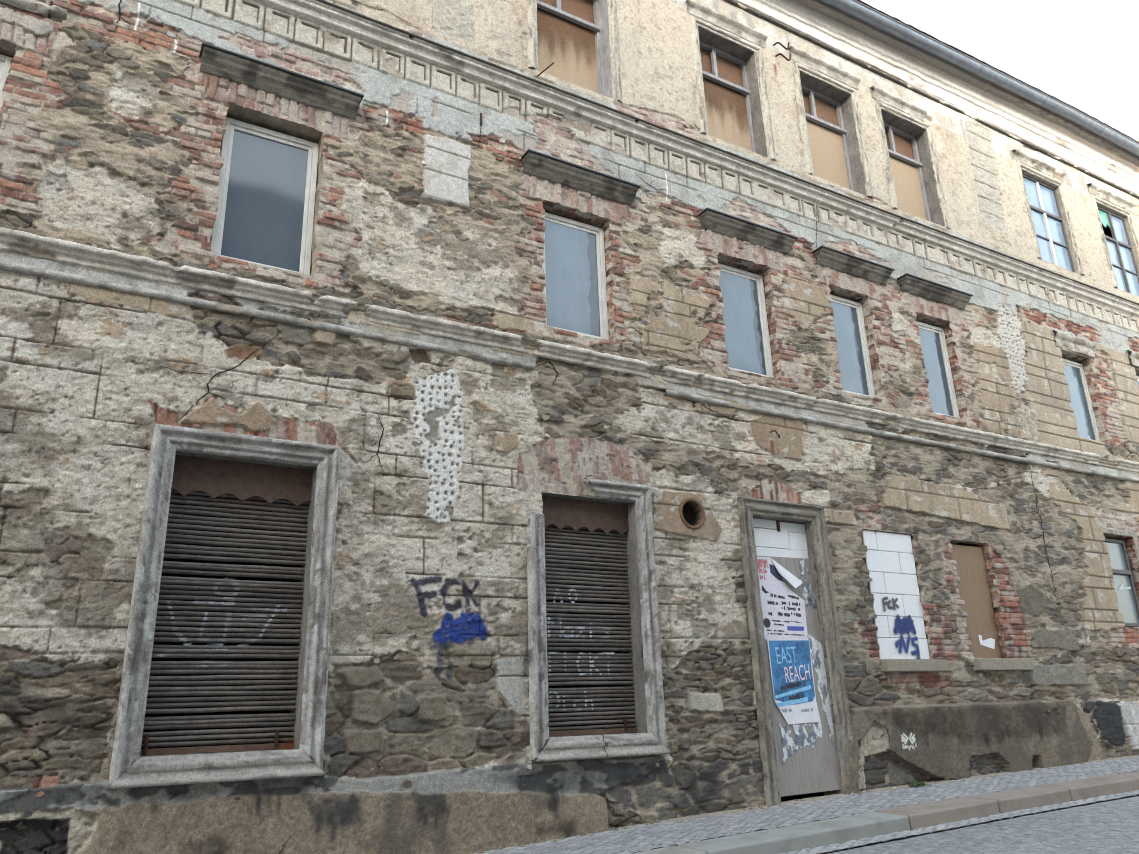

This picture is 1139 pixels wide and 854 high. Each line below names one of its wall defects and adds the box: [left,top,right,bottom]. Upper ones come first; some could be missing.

flaking render [0,0,1139,464]
crack [160,329,283,422]
flaking render [494,357,1139,791]
leakage [311,797,360,838]
flaking render [0,640,766,854]